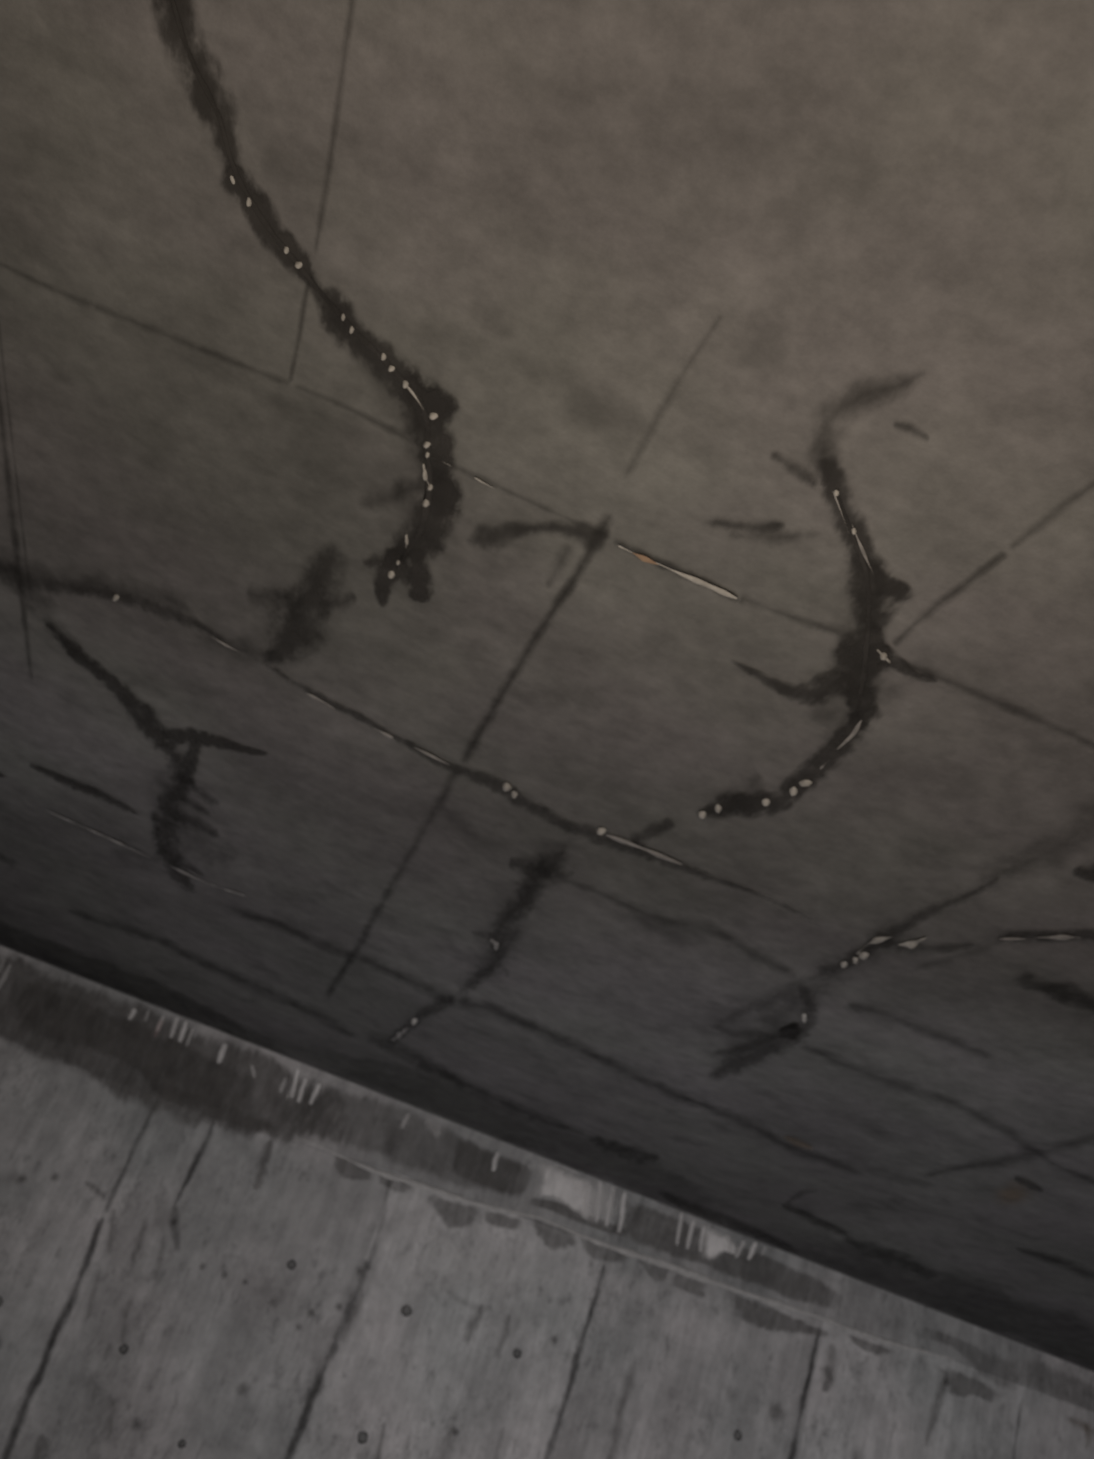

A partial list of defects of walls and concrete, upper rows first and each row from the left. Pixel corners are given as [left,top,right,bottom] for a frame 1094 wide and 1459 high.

crack [154,0,493,605]
crack [48,583,128,602]
crack [0,624,267,886]
crack [274,448,936,1041]
crack [1074,868,1094,882]
crack [1001,932,1094,942]
damp [0,958,324,1137]
damp [541,1167,626,1232]
damp [665,1195,796,1260]